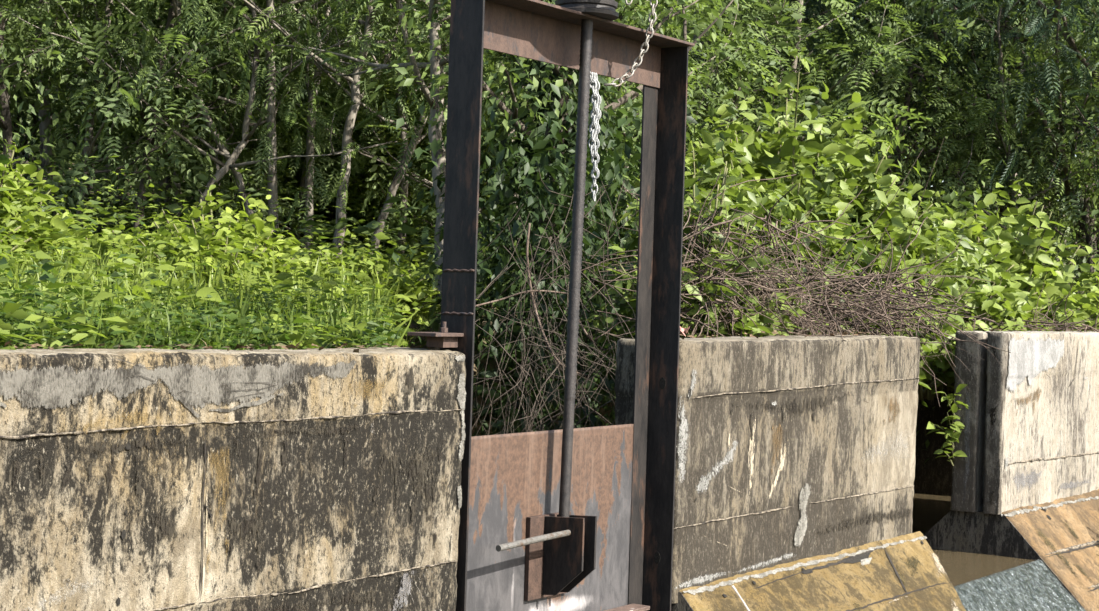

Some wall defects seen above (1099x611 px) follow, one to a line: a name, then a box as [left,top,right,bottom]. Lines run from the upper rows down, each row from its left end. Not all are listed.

leakage [56,434,193,522]
leakage [147,507,184,546]
leakage [225,423,359,574]
leakage [401,367,419,399]
leakage [373,444,450,548]
leakage [676,369,697,483]
leakage [696,391,849,492]
leakage [818,507,912,535]
flaking render [1007,337,1064,392]
leakage [390,571,414,611]